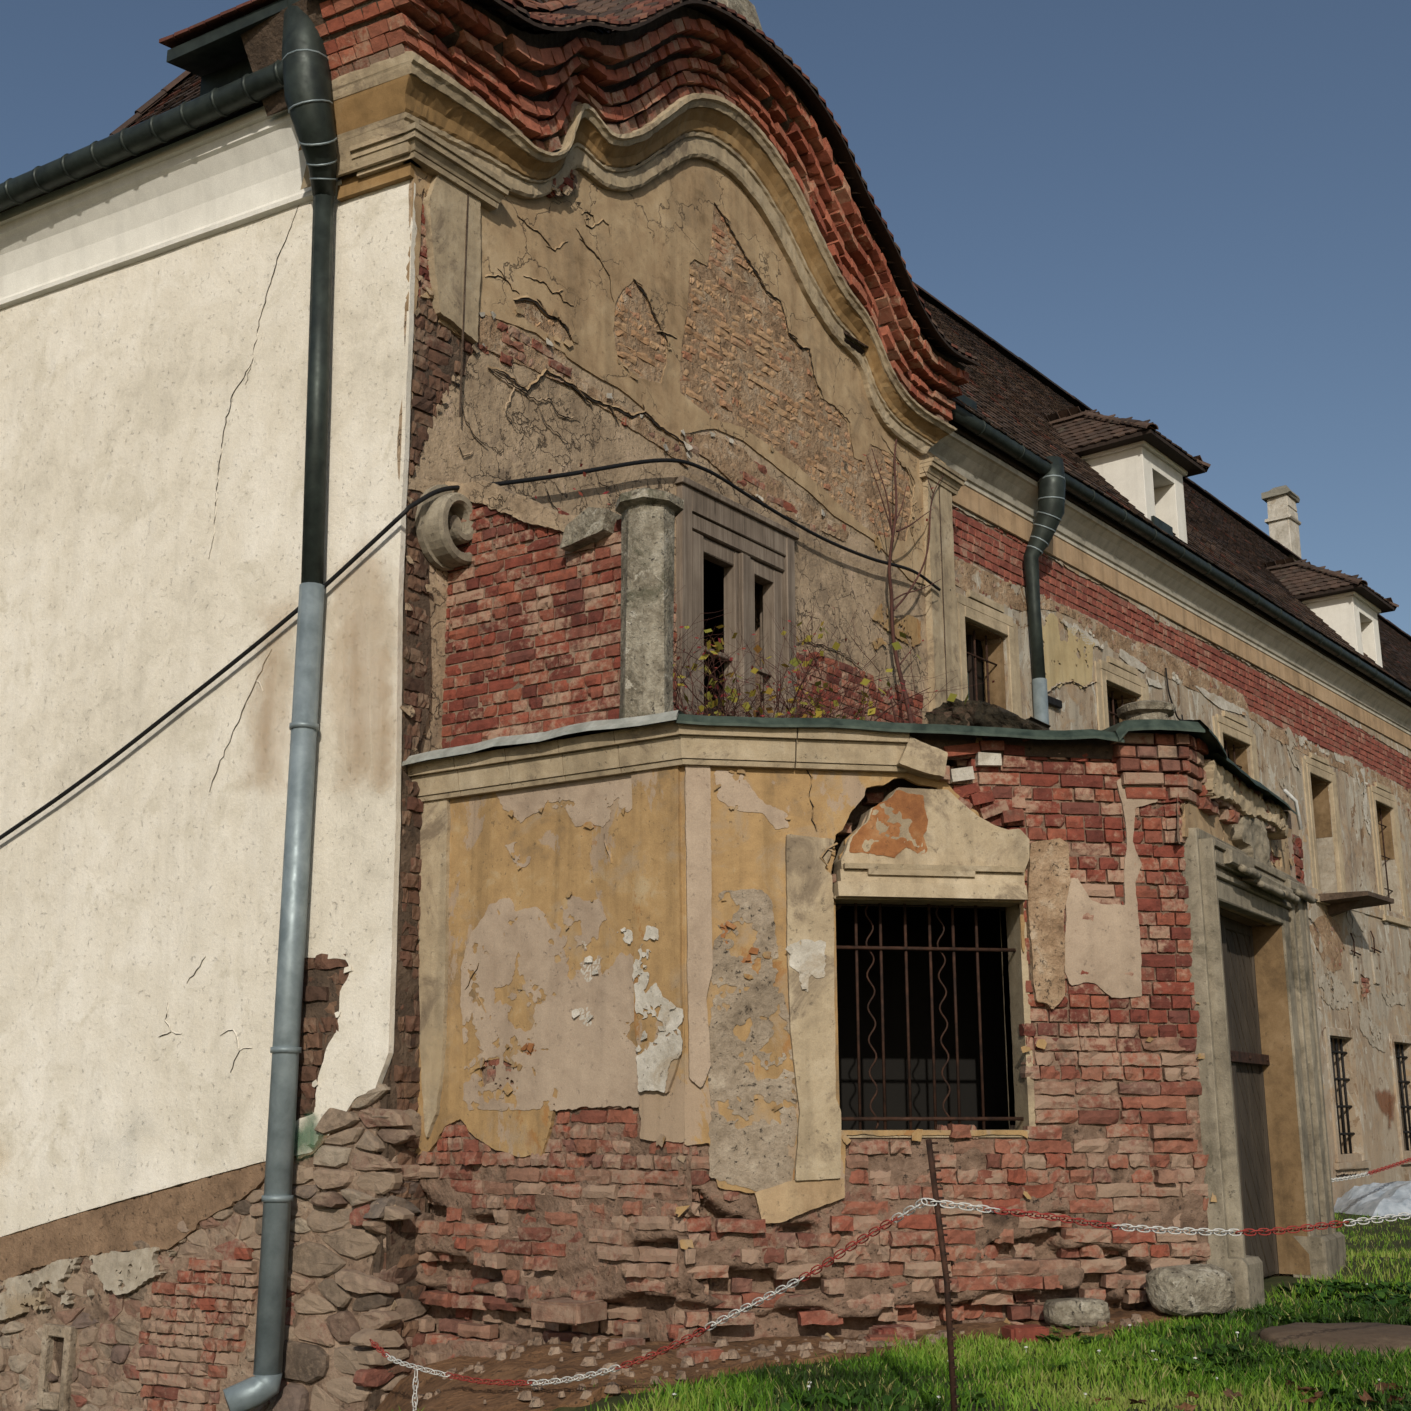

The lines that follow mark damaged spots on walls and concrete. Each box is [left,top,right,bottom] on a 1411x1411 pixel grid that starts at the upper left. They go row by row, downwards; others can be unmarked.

flaking render [400,191,923,762]
peeling [383,736,1217,1375]